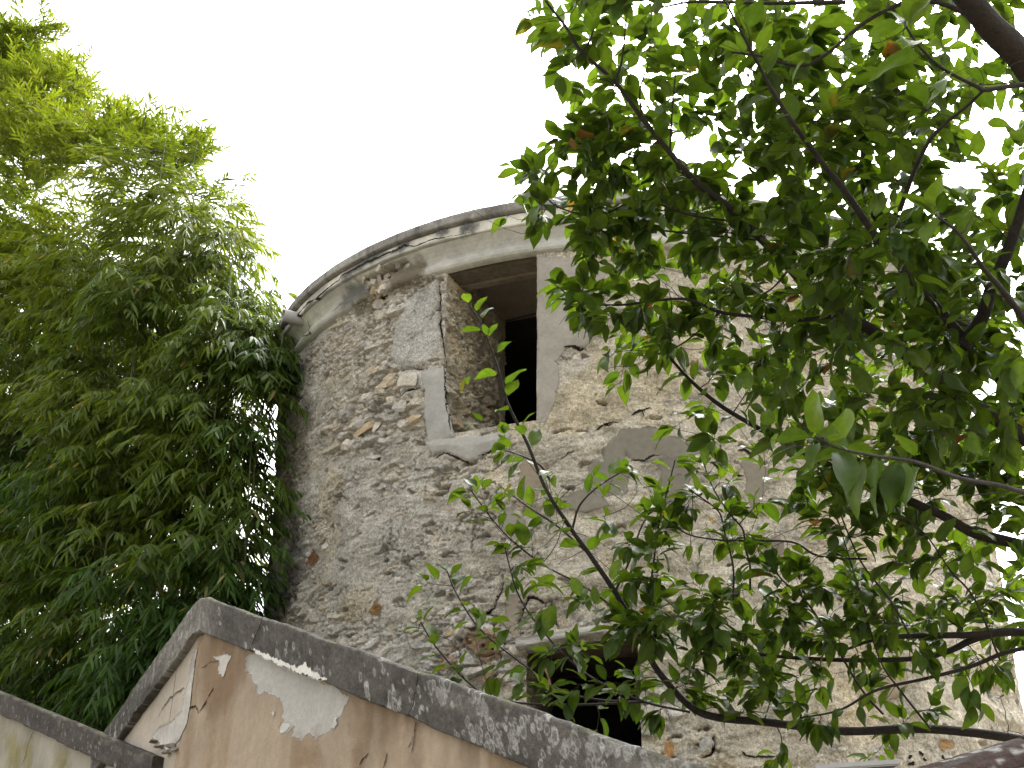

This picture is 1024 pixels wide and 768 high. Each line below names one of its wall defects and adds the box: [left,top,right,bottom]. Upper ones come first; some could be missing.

peeling [149,649,198,754]
crack [159,661,218,715]
peeling [245,653,349,741]